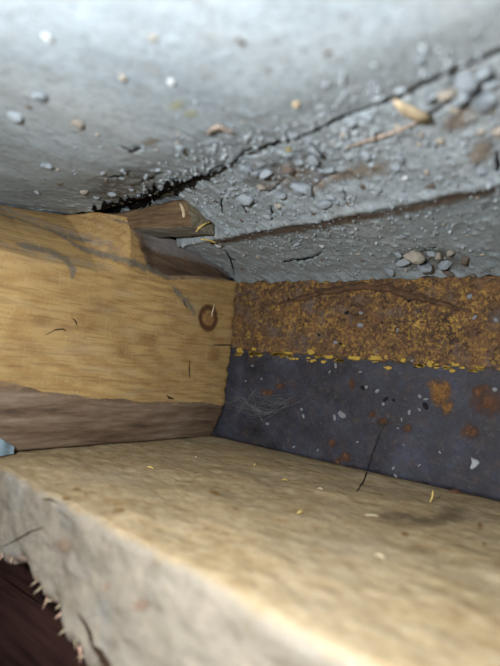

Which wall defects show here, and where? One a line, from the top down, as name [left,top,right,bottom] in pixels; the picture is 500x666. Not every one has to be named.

crack [82,49,500,219]
rust [230,276,500,373]
rust [430,381,452,414]